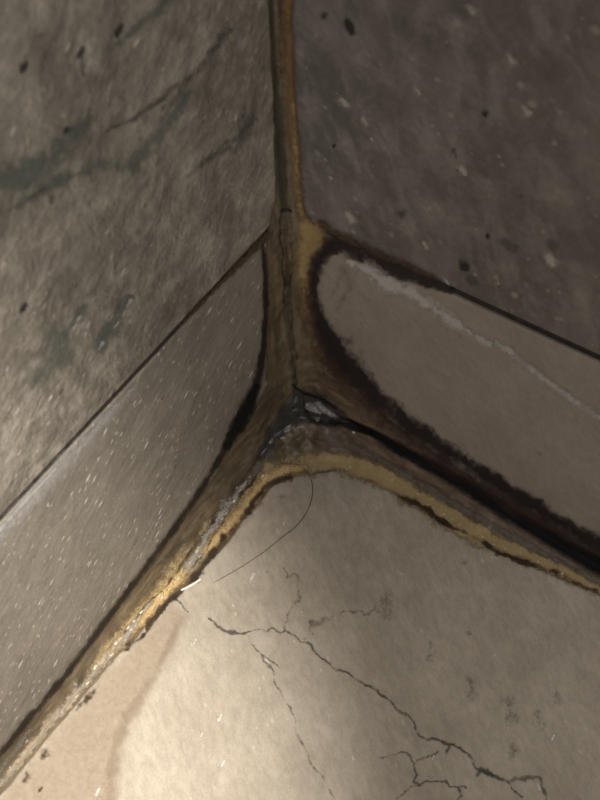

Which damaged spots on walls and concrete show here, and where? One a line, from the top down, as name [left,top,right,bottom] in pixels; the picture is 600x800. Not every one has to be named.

peeling [261,396,338,455]
leakage [292,236,600,555]
crack [208,597,547,800]